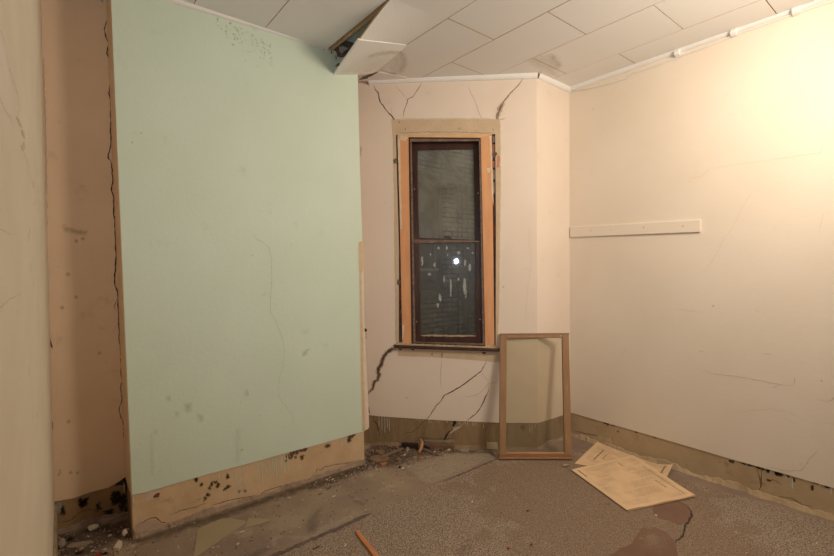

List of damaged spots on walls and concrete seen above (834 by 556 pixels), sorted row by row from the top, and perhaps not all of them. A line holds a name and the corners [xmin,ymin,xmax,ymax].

crack [102,21,110,56]
spalling [328,41,354,67]
crack [369,84,421,119]
crack [469,79,523,120]
crack [107,85,124,437]
crack [368,348,396,435]
crack [404,359,498,434]
damp [78,478,131,515]